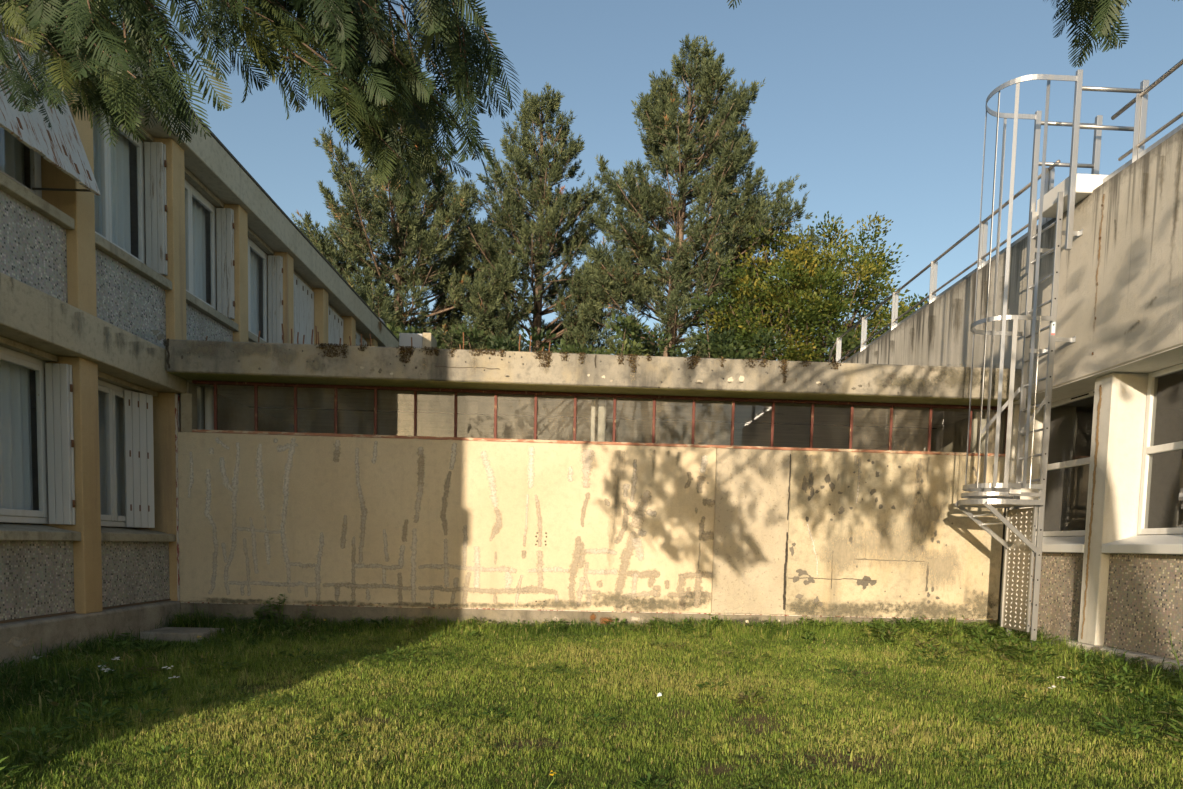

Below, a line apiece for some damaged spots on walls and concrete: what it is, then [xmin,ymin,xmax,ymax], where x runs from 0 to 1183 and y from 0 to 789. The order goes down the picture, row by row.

peeling [802,459,901,521]
crack [783,454,929,610]
peeling [793,569,835,607]
peeling [856,566,886,604]
water stain [790,592,996,618]